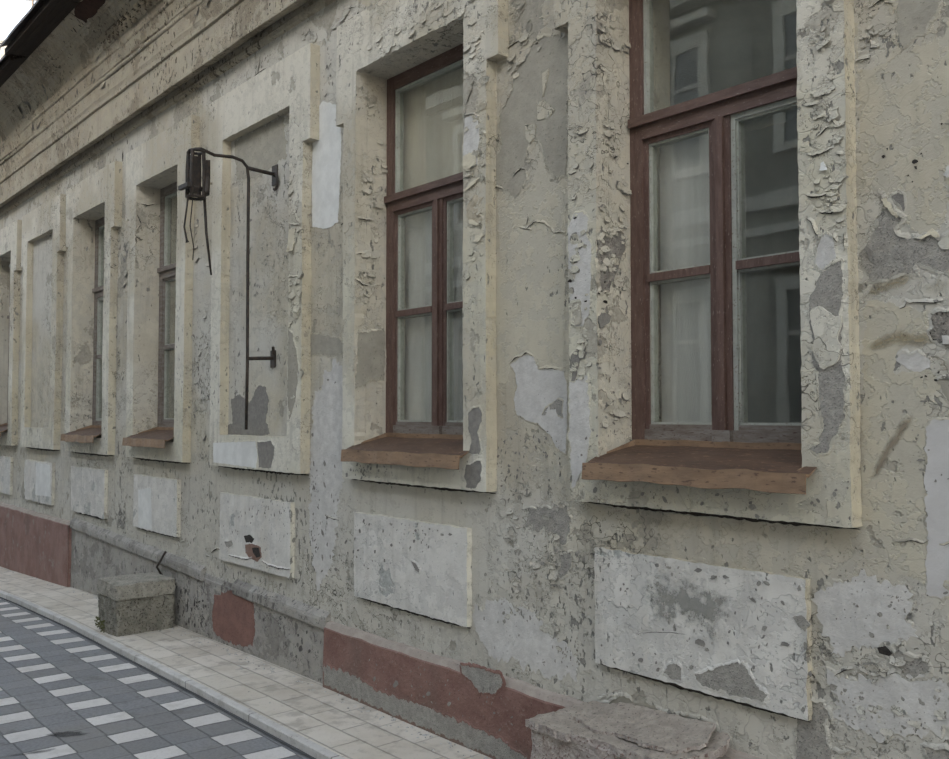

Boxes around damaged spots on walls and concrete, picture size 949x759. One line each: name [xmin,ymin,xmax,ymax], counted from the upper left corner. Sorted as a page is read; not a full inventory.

spalling [71,0,123,93]
peeling [349,0,490,92]
peeling [231,29,342,266]
peeling [462,0,594,198]
peeling [810,76,846,146]
spalling [859,188,949,284]
spalling [191,309,276,470]
spalling [460,117,632,718]
spalling [808,257,851,457]
crack [587,502,857,529]
peeling [323,658,529,759]
spalling [638,626,776,705]